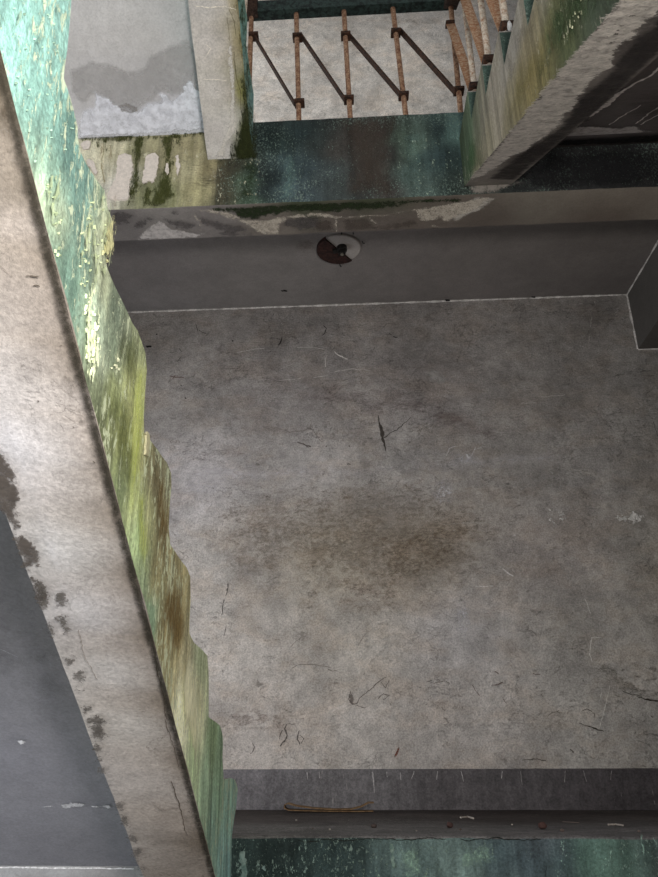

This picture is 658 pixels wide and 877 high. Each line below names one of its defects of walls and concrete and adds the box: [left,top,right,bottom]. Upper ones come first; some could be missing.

leakage [79,81,204,138]
leakage [413,0,658,226]
crack [589,68,658,125]
peeling [79,153,181,382]
leakage [0,454,70,639]
leakage [81,705,108,774]